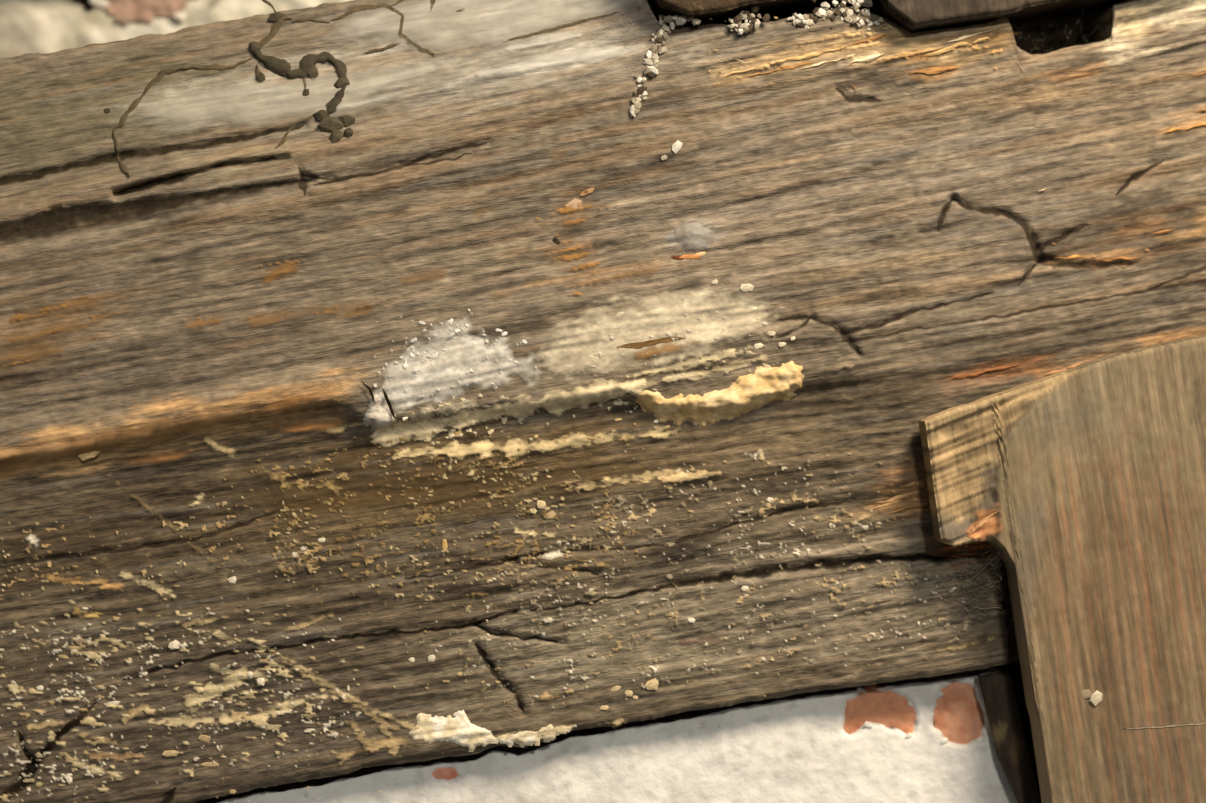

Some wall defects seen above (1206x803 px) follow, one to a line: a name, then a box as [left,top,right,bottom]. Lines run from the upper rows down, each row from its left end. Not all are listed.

crack [1116,158,1165,195]
crack [767,198,1206,355]
damp [823,361,856,371]
damp [262,397,310,410]
damp [288,311,804,503]
damp [0,412,235,478]
damp [261,457,347,507]
crack [123,500,996,713]